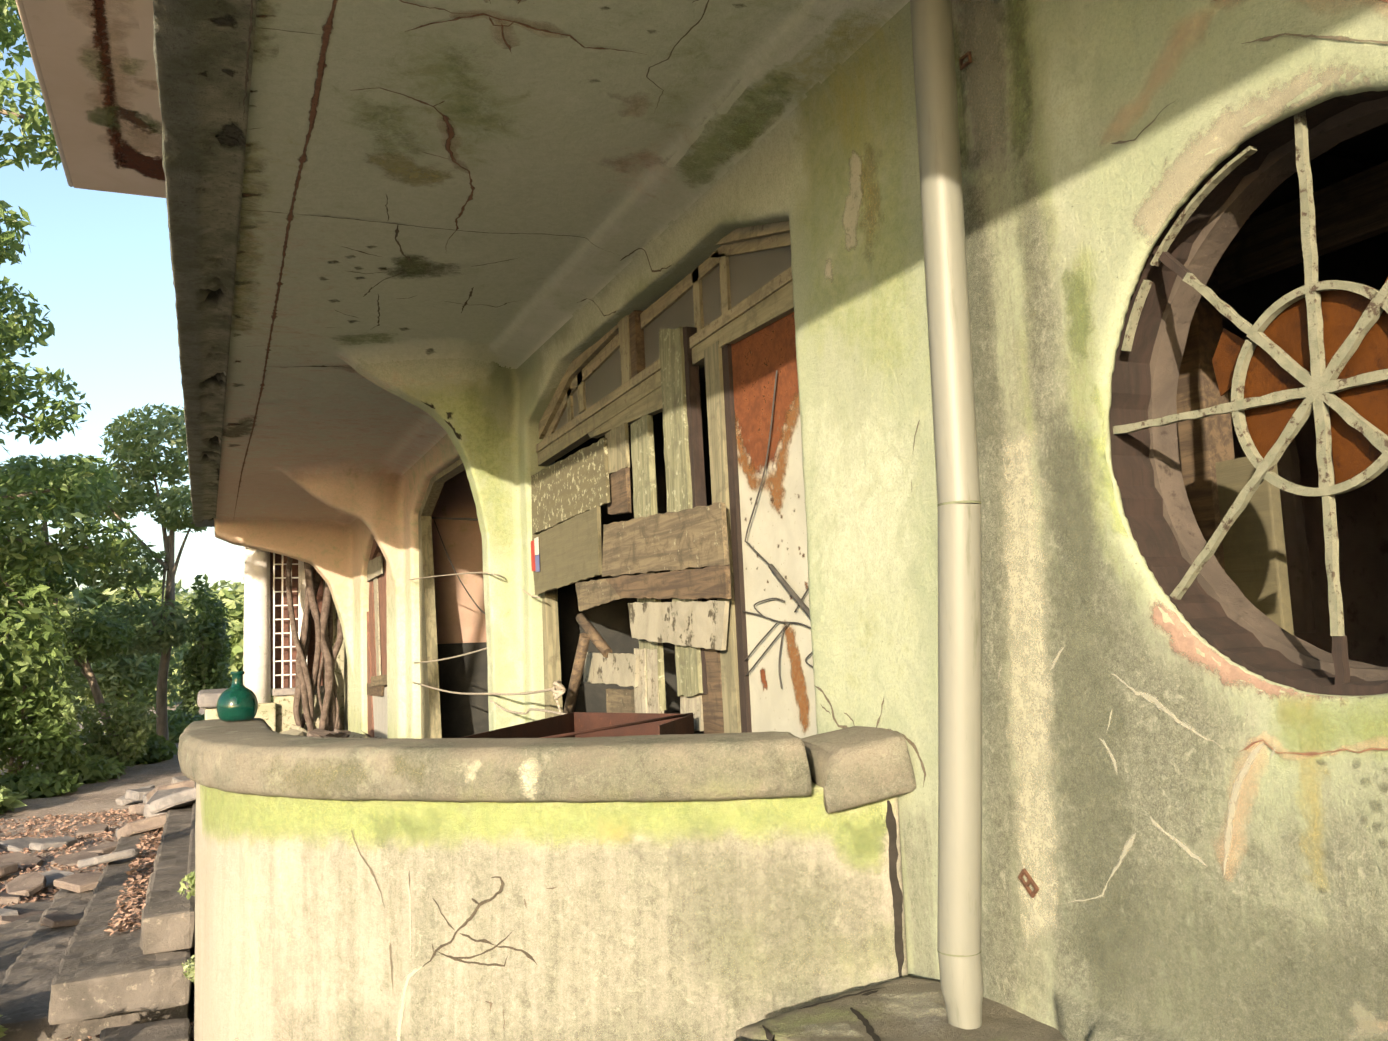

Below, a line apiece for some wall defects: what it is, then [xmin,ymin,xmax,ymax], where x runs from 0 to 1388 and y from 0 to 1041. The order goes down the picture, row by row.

crack [1242,33,1388,44]
rust [90,0,165,181]
crack [1111,100,1176,144]
spalling [1133,64,1373,244]
crack [234,0,709,515]
damp [223,419,256,447]
damp [521,763,540,798]
crack [814,685,926,787]
crack [1112,673,1388,756]
crack [351,830,556,1041]
crack [800,800,904,1041]
crack [762,1025,775,1041]